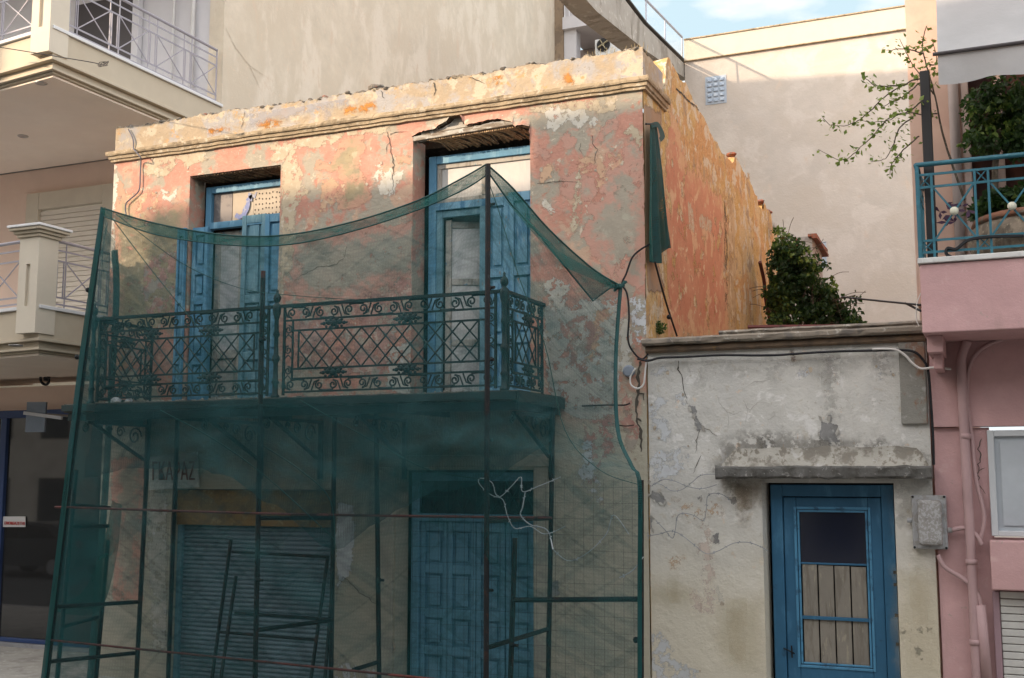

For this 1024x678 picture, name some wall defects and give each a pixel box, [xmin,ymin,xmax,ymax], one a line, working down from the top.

crack [386,131,407,194]
flaking render [411,96,616,154]
peeling [539,103,730,506]
crack [635,361,651,482]